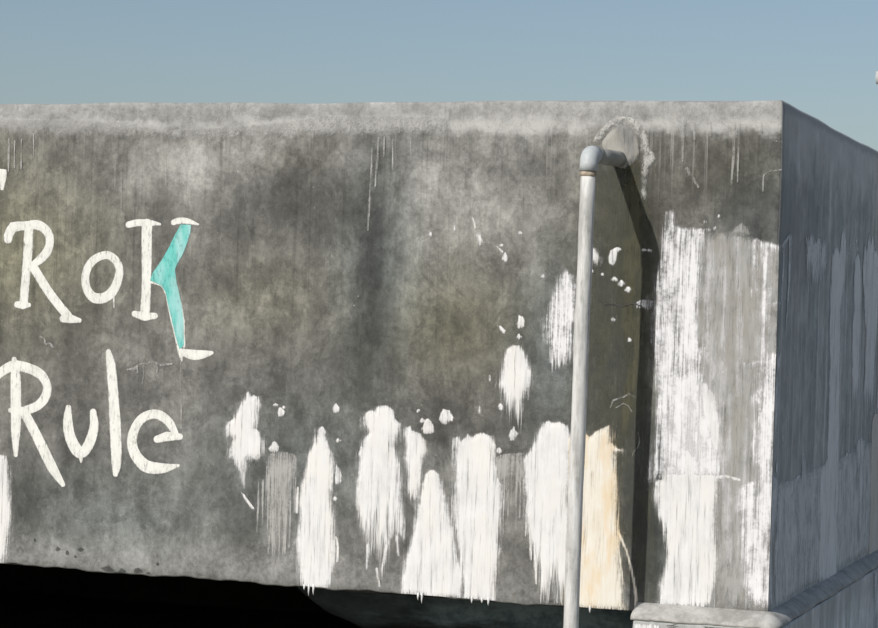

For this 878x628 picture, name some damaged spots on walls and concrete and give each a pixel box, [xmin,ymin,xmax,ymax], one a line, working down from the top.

damp [368,137,394,225]